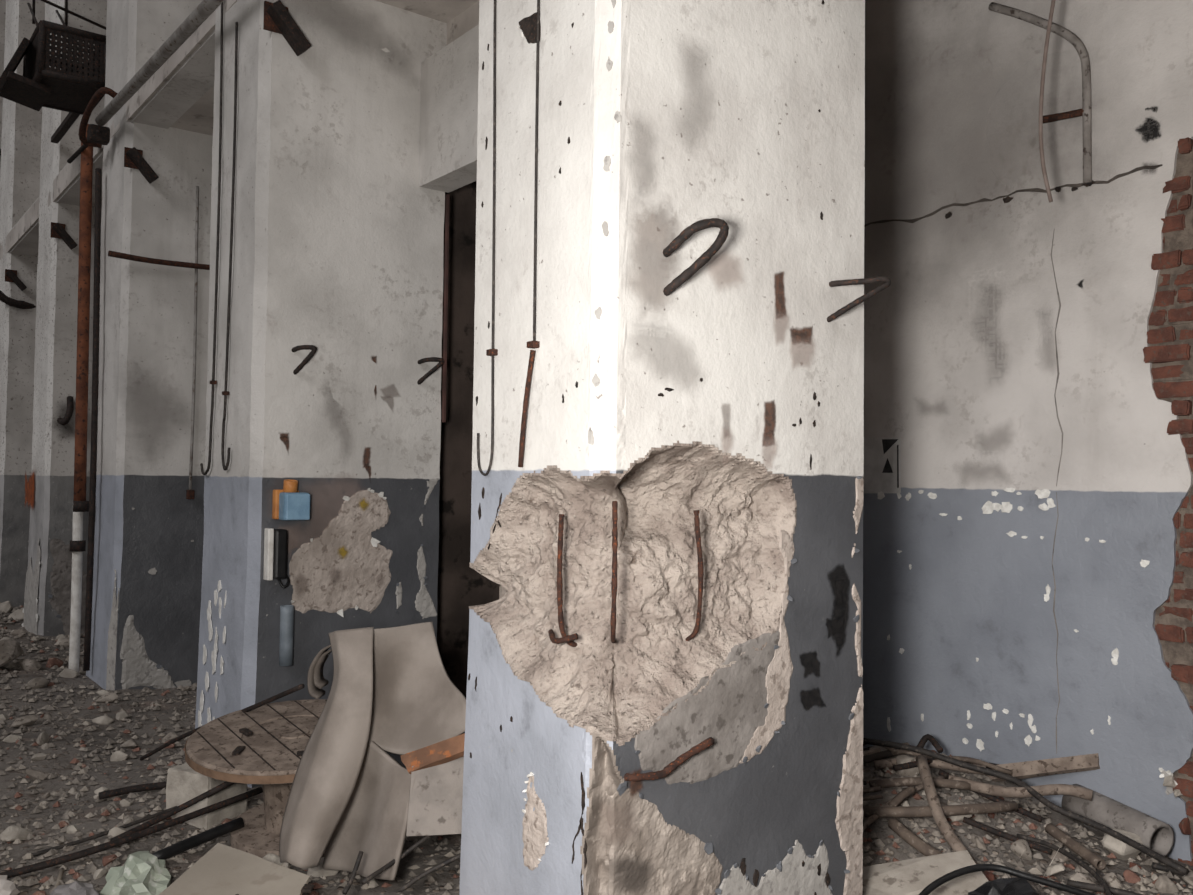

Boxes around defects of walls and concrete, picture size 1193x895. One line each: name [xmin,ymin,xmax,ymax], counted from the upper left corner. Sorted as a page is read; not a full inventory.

crack [864,164,1163,228]
corrosion [775,272,786,318]
corrosion [790,327,812,343]
corrosion [763,401,775,446]
flaking render [1143,137,1193,711]
peeling [289,488,437,619]
peeling [852,476,937,558]
peeling [981,488,1056,514]
peeling [106,569,226,727]
spalling [469,441,864,895]
peeling [962,703,1041,752]
flaking render [1159,753,1193,866]